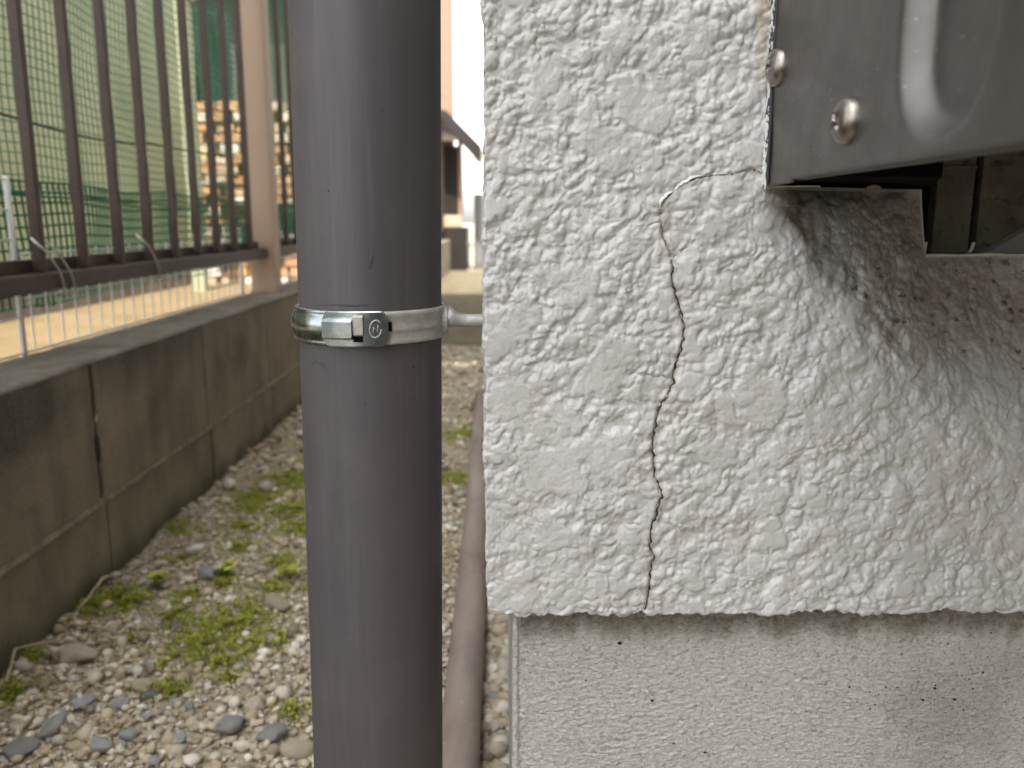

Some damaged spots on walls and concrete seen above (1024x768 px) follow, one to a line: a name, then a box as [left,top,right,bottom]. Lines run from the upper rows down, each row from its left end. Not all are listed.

crack [628,169,759,619]